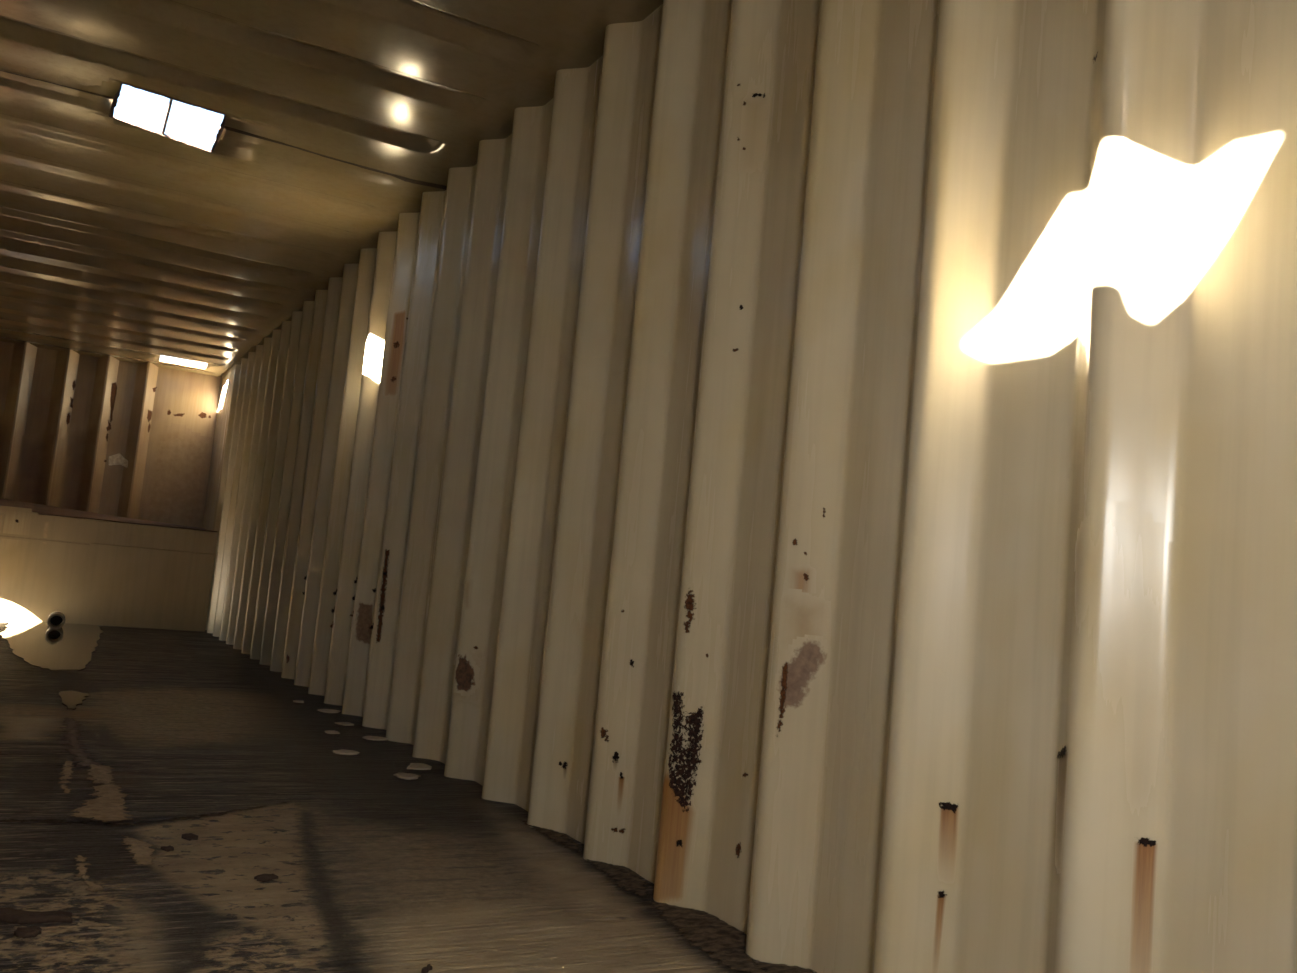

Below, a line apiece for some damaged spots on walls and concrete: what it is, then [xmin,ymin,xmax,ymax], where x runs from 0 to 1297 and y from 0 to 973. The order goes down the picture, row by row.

corrosion [450,643,489,717]
corrosion [649,691,704,907]
corrosion [684,590,696,633]
corrosion [773,538,835,736]
corrosion [928,802,961,973]
corrosion [1053,500,1215,973]